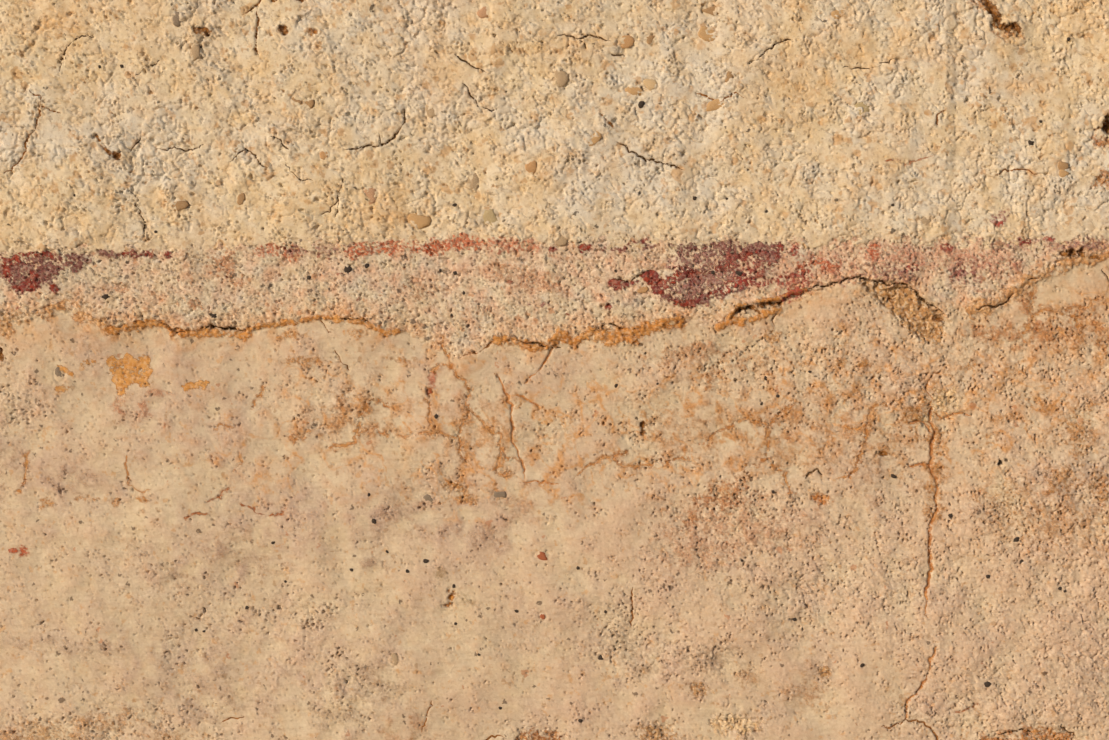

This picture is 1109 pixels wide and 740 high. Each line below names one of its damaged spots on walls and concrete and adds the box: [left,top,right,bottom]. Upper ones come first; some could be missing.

crack [243,0,304,54]
crack [558,34,625,57]
spalling [971,0,1022,38]
crack [454,54,495,112]
crack [4,90,60,173]
crack [230,136,313,181]
crack [345,110,406,150]
crack [617,142,683,170]
crack [161,322,245,333]
crack [772,276,944,331]
crack [289,336,970,617]
crack [881,646,938,740]